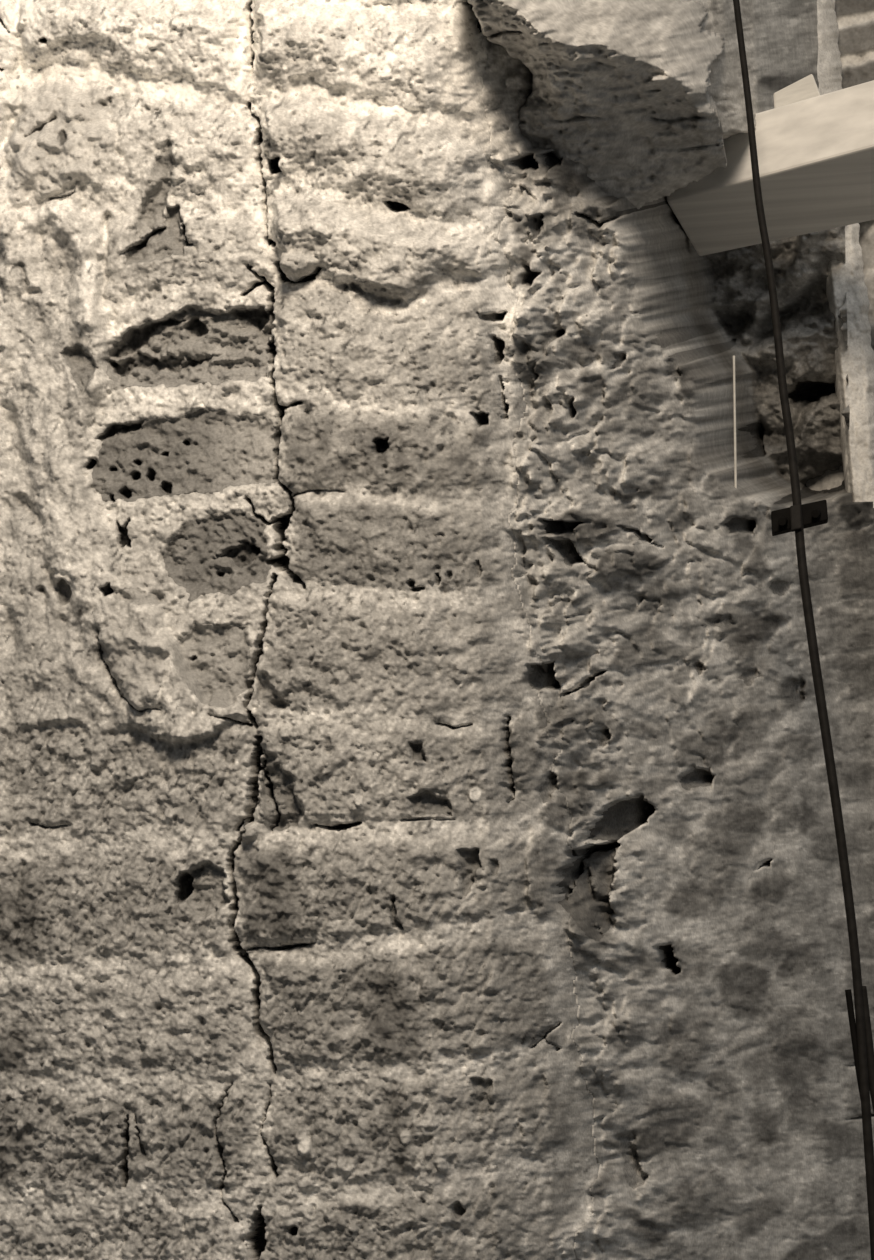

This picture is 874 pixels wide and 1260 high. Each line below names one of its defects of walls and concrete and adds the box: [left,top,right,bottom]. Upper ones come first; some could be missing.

crack [248,4,256,73]
crack [250,103,273,245]
spalling [62,306,276,395]
spalling [86,409,282,502]
spalling [163,511,275,602]
hole [543,519,583,566]
crack [220,280,339,1037]
hole [528,663,605,695]
hole [556,795,655,941]
crack [123,1119,145,1183]
crack [262,1066,279,1175]
crack [237,1213,267,1259]